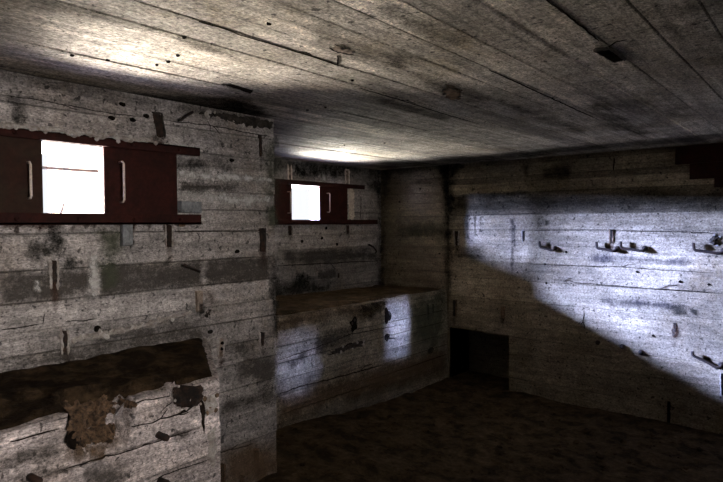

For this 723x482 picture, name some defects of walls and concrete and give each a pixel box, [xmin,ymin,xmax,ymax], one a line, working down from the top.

spalling [0,121,158,145]
water stain [0,137,391,339]
water stain [314,328,350,355]
spalling [173,385,219,415]
spalling [63,394,138,448]